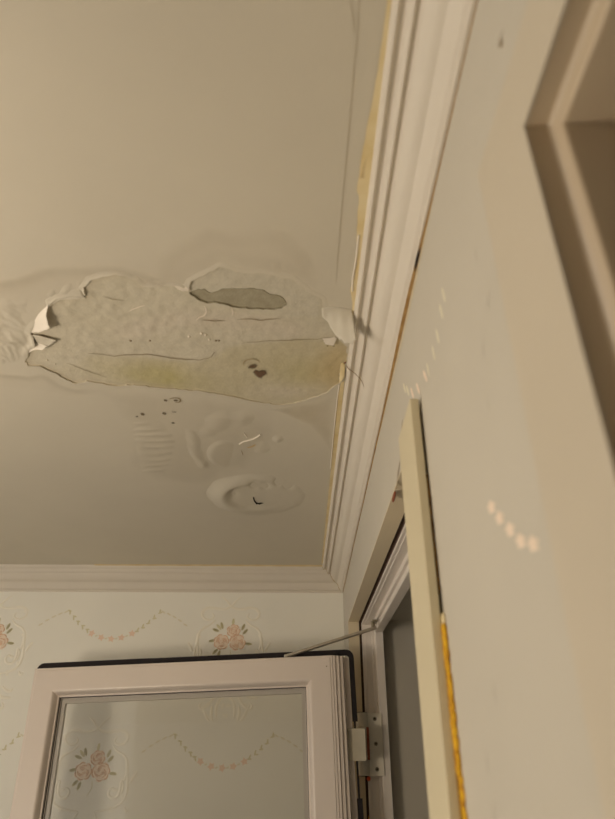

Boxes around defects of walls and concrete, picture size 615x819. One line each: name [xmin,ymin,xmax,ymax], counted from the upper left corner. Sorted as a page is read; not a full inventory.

peeling [25,262,356,407]